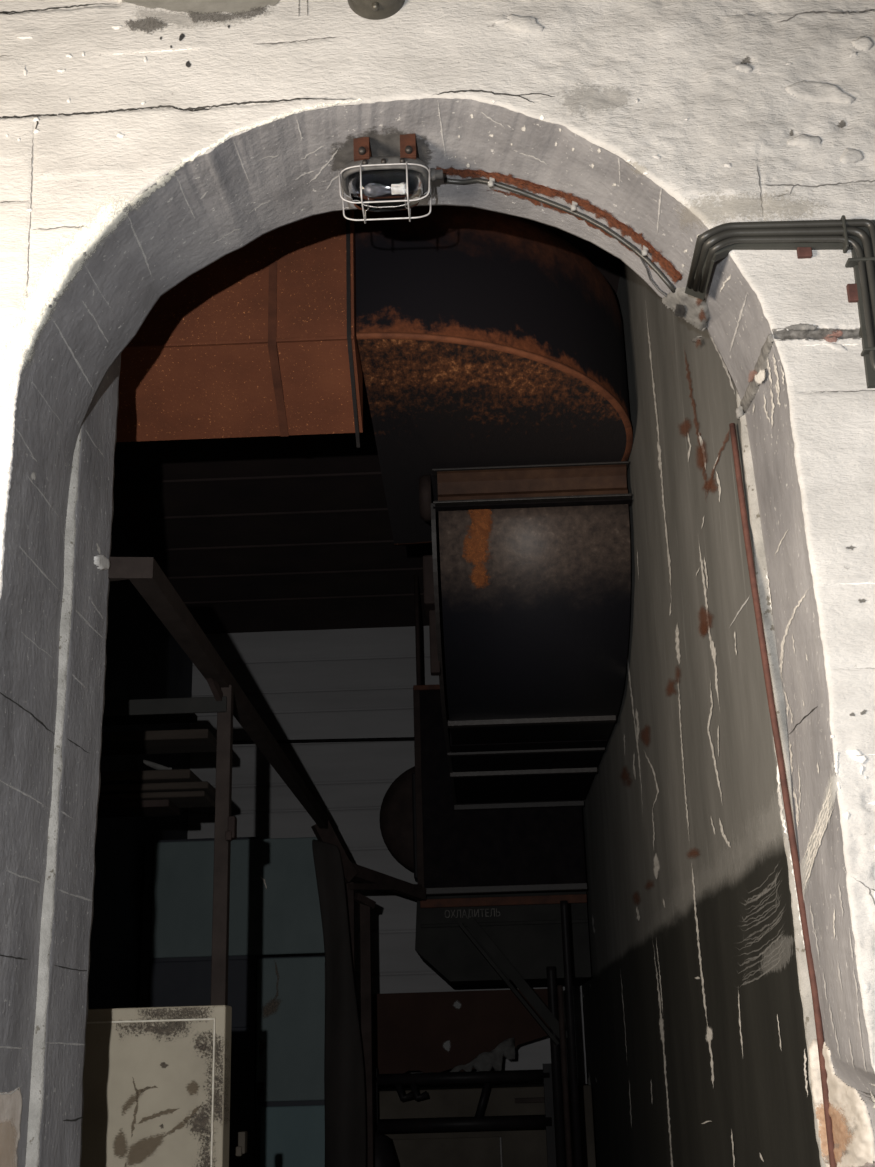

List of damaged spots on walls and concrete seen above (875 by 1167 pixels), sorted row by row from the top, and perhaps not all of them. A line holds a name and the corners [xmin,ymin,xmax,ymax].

crack [780,9,875,22]
corrosion [437,166,682,283]
efflorescence [0,98,362,571]
corrosion [462,509,492,588]
flaking render [0,1087,22,1167]
spalling [808,1039,875,1167]